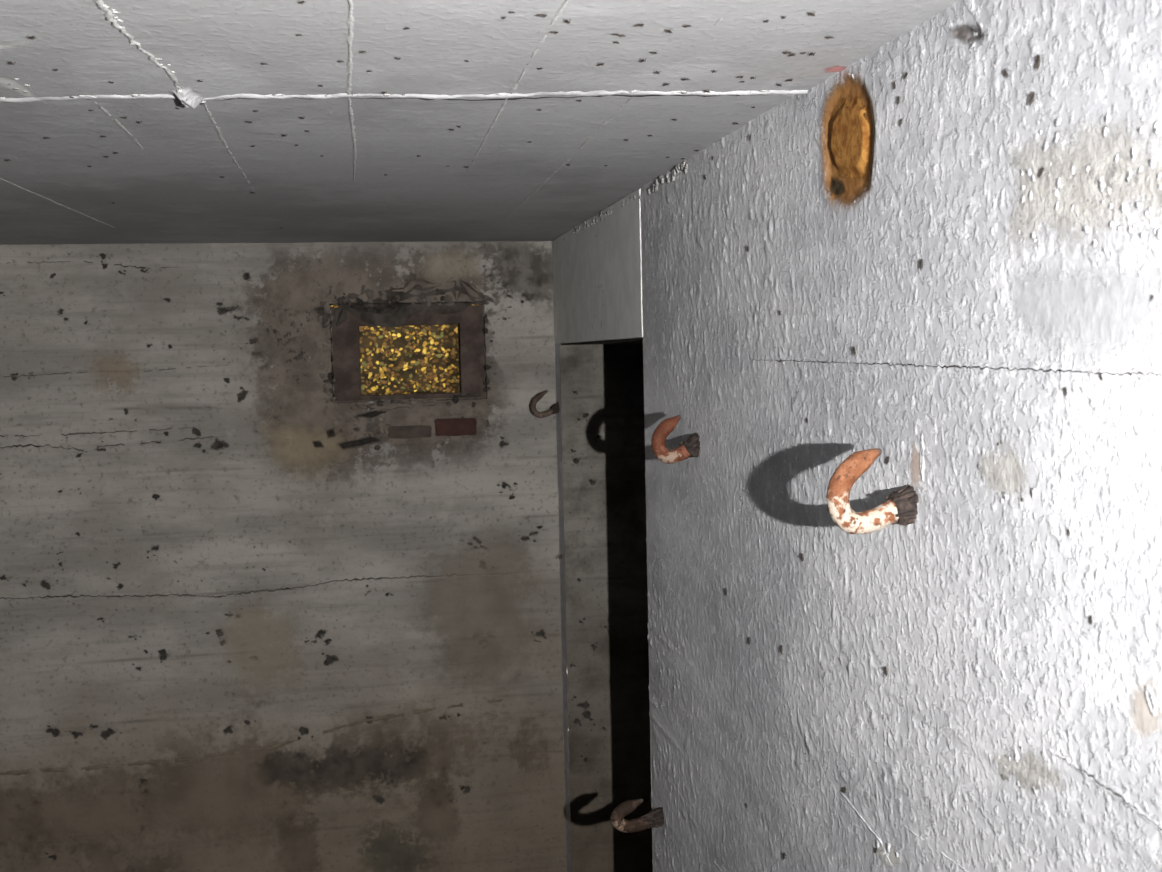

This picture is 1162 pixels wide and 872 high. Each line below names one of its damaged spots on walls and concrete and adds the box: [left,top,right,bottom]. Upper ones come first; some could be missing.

crack [209,93,793,103]
leakage [249,246,553,471]
crack [749,356,1162,380]
corrosion [911,434,925,486]
leakage [0,725,485,872]
crack [1049,748,1162,834]